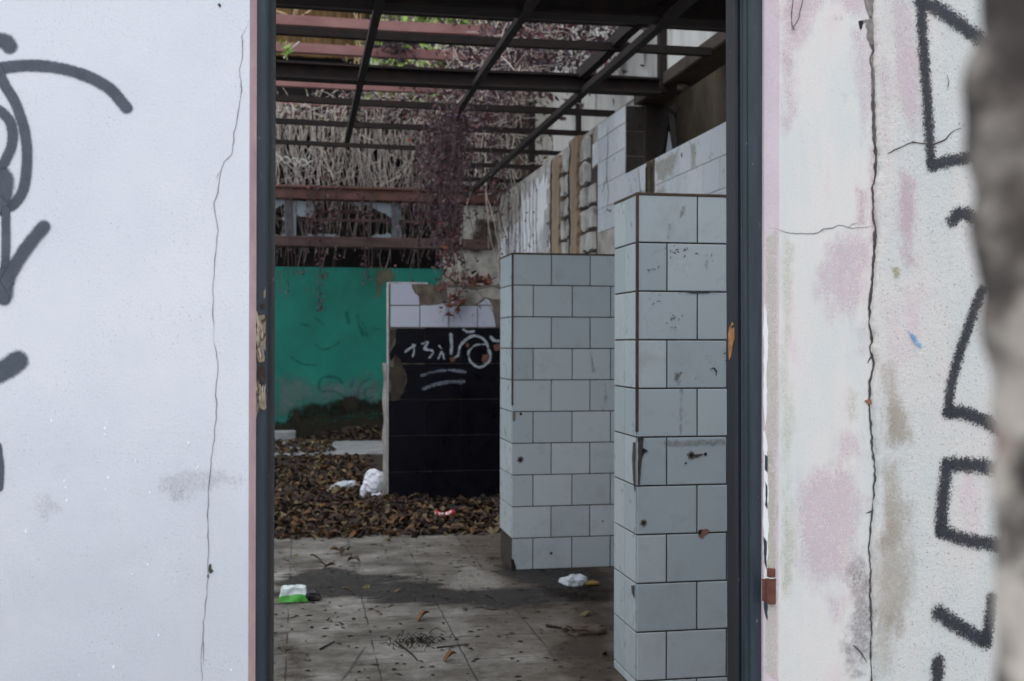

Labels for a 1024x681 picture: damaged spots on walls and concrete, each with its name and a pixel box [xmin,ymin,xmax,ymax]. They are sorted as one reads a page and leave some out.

crack [201,27,247,679]
peeling [256,289,406,417]
spalling [413,284,434,304]
spalling [447,283,501,326]
crack [775,15,961,681]